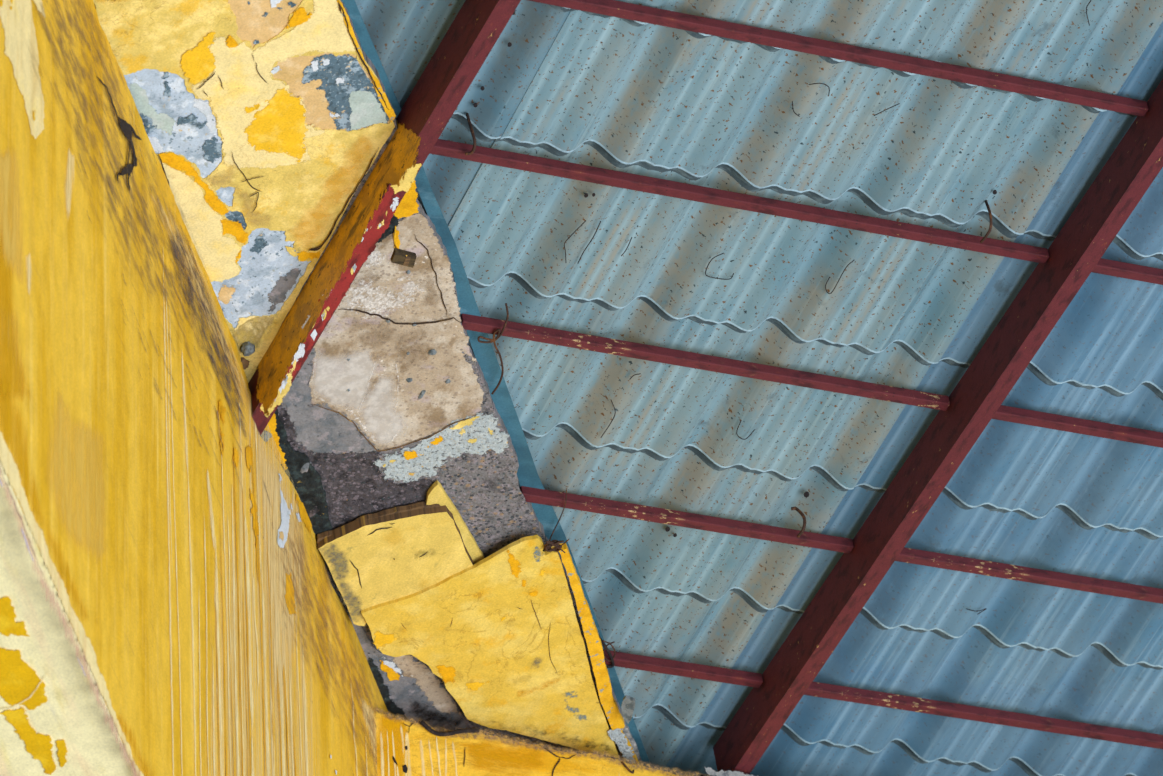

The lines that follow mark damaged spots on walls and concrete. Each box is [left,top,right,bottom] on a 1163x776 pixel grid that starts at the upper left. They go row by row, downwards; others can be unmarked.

peeling [0,154,31,292]
peeling [0,0,45,139]
crack [96,76,170,192]
peeling [93,0,396,397]
peeling [0,432,144,776]
leakage [0,245,148,776]
leakage [123,300,310,776]
mould [325,545,361,616]
spalling [259,180,544,700]